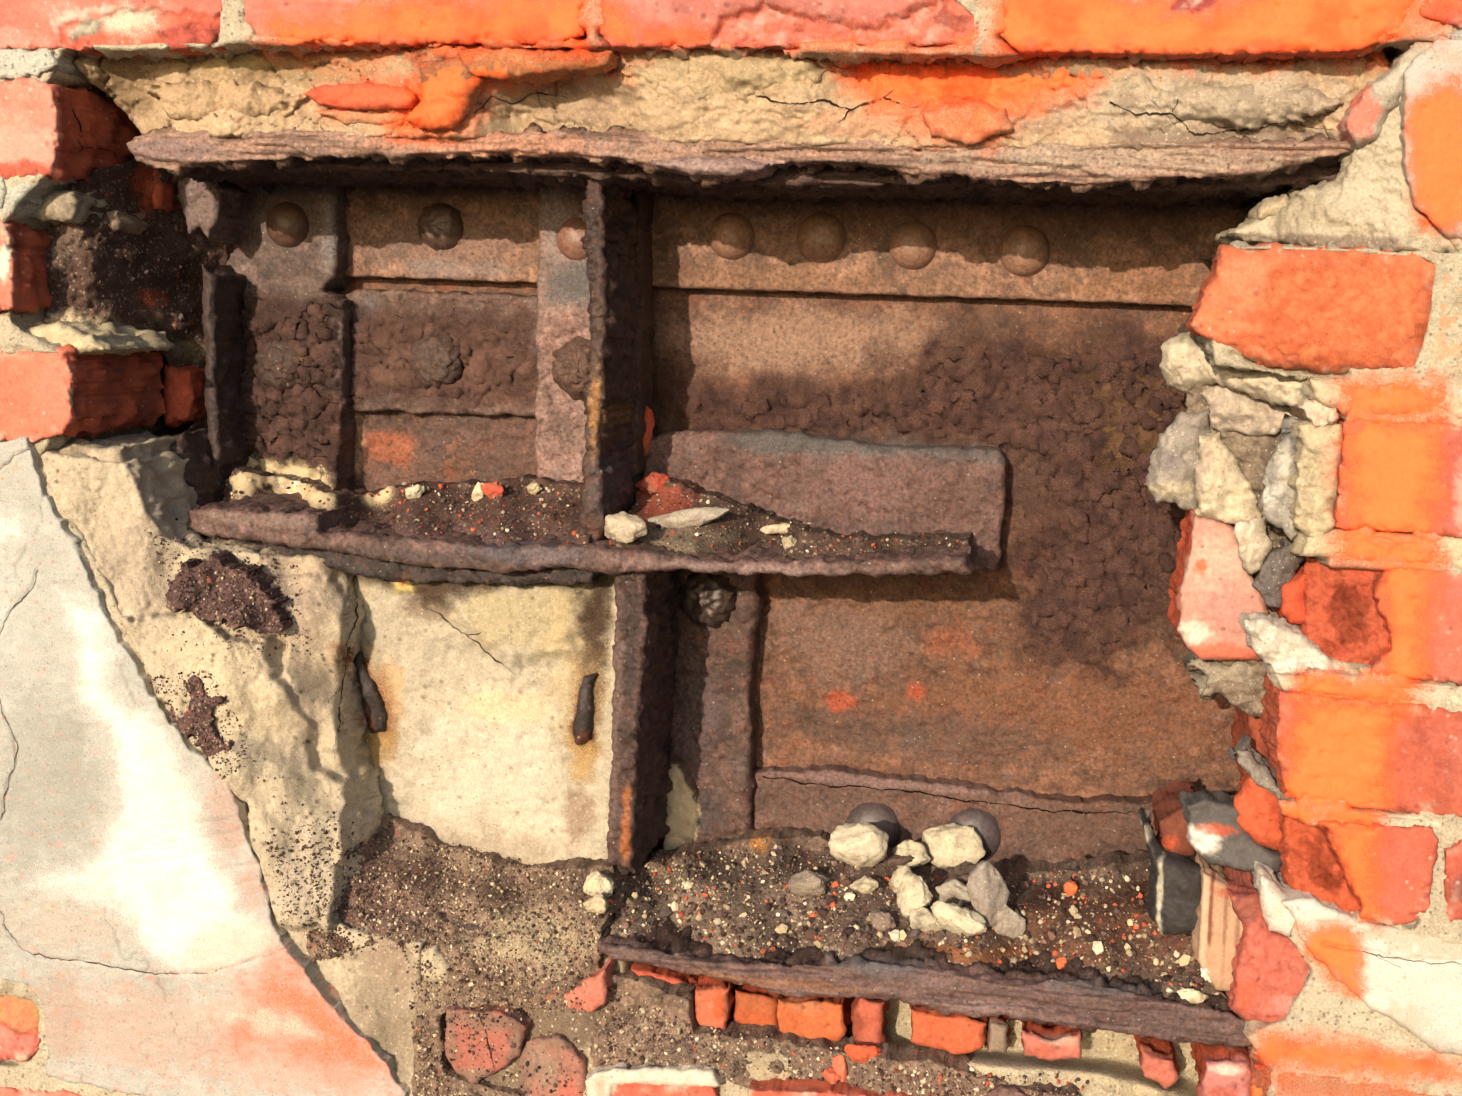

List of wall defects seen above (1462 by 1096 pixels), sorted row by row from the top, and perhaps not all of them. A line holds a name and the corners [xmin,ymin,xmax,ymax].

corrosion [178,177,250,244]
spalling [73,0,1455,370]
corrosion [170,264,537,506]
corrosion [652,315,1187,678]
crack [0,572,37,633]
corrosion [566,580,613,780]
spalling [1300,557,1391,664]
crack [0,701,18,821]
spalling [40,450,428,1096]
crack [0,911,284,975]
spalling [1223,867,1310,1023]
spalling [444,1005,587,1096]